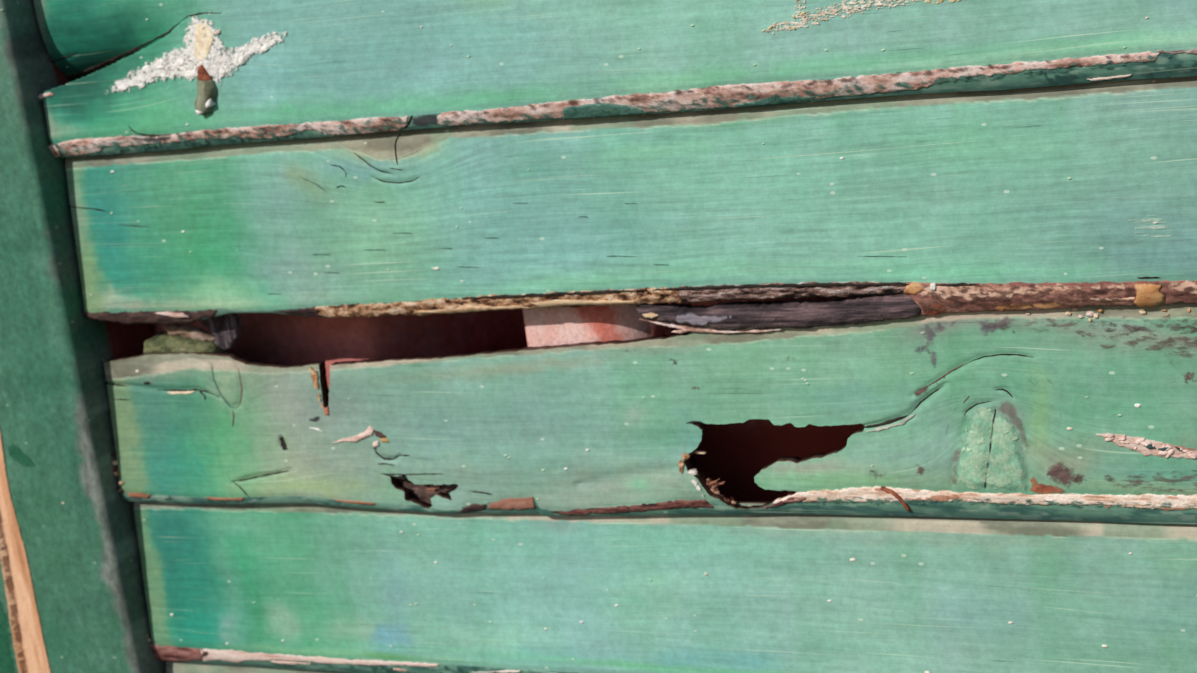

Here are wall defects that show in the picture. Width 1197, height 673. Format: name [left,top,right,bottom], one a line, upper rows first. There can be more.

peeling [762,0,959,34]
peeling [109,16,286,93]
peeling [49,49,1197,157]
leakage [980,317,1014,334]
leakage [1100,318,1197,356]
crack [212,367,243,426]
crack [863,354,1034,432]
peeling [1096,433,1197,459]
spalling [382,473,535,513]
peeling [764,486,1197,510]
leakage [1107,474,1197,491]